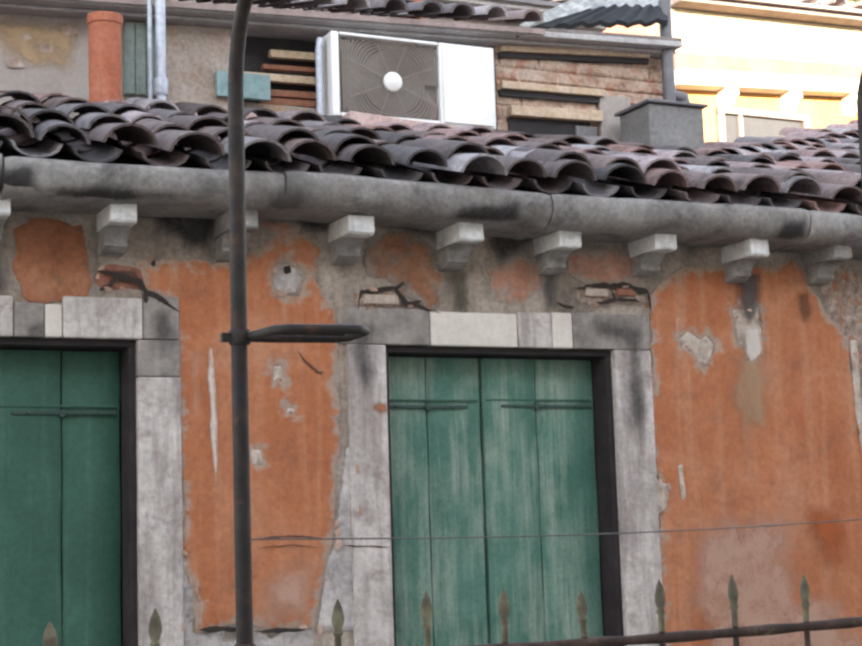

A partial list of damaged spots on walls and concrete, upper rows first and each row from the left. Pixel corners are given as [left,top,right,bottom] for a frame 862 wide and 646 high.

crack [97,260,180,312]
spalling [273,263,301,297]
spalling [353,287,413,311]
spalling [576,286,650,308]
flaking render [733,308,765,349]
flaking render [679,331,714,367]
spalling [820,266,862,449]